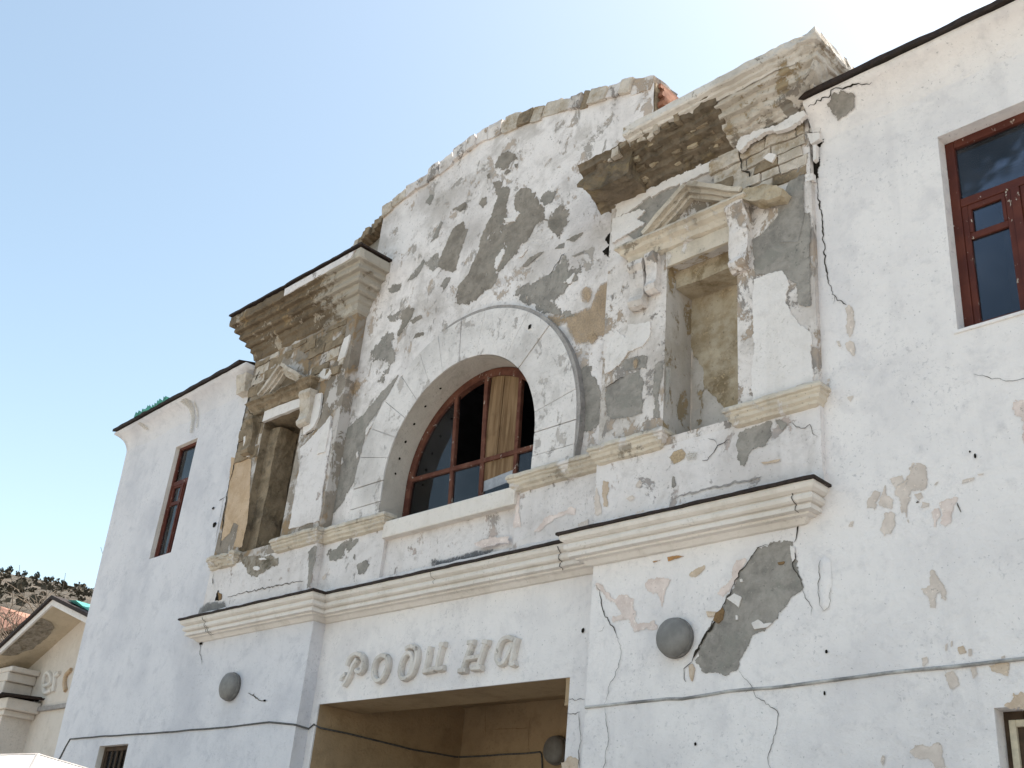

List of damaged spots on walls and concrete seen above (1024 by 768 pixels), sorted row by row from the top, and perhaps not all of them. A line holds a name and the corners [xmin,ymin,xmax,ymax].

crack [808,83,871,107]
peeling [827,90,855,121]
spalling [388,151,584,319]
flaking render [611,110,811,307]
crack [817,183,846,305]
spalling [221,319,351,577]
spalling [581,355,670,432]
spalling [736,419,787,466]
spalling [307,538,370,588]
spalling [688,540,804,681]
crack [566,592,621,768]
crack [739,671,779,767]